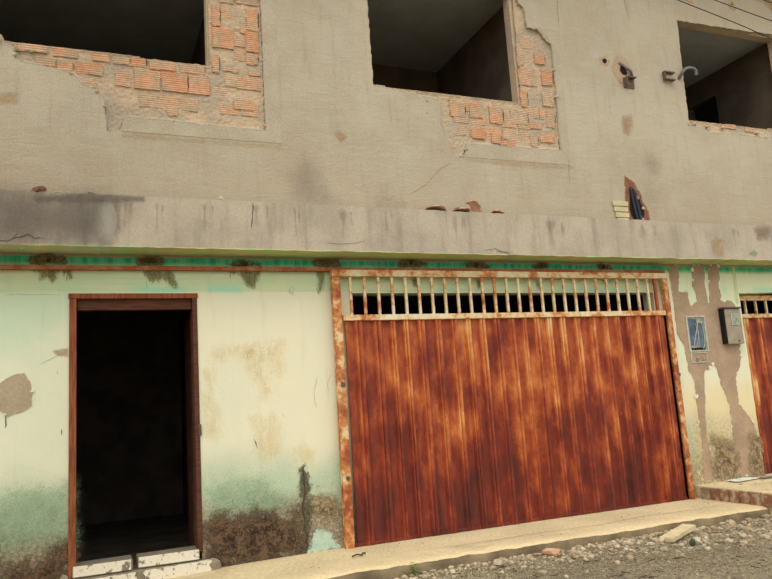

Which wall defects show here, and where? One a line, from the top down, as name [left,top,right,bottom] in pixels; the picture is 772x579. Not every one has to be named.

spalling [0,0,267,131]
spalling [373,0,561,157]
spalling [688,120,772,139]
water stain [0,192,143,240]
hole [612,177,649,220]
peeling [0,373,35,428]
peeling [668,264,763,482]
water stain [202,496,340,567]
water stain [0,541,78,579]